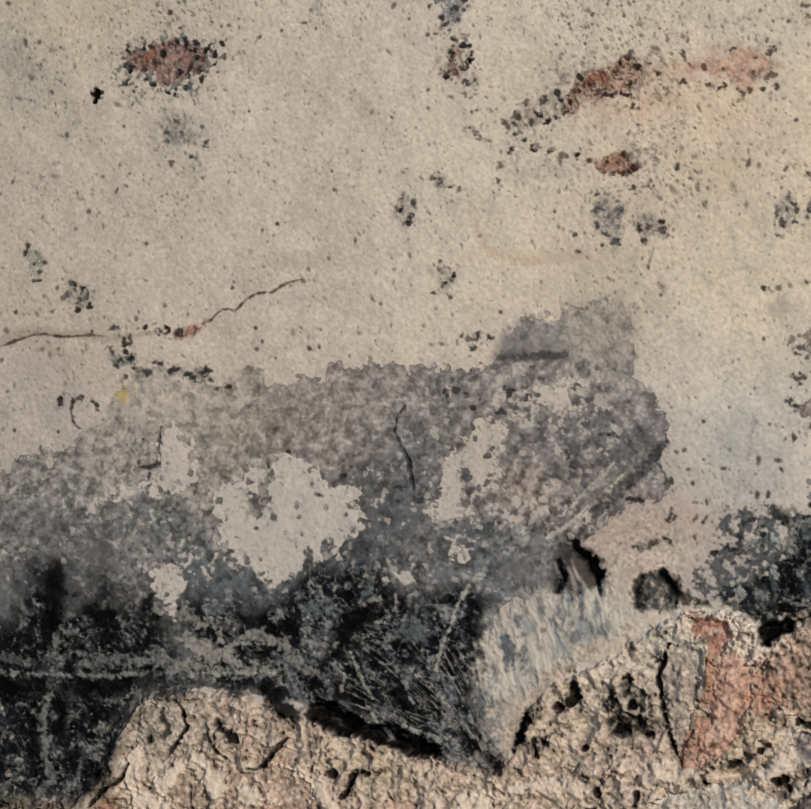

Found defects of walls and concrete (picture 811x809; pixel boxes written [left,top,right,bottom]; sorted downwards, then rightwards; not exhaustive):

crack [208,279,301,322]
peeling [0,301,674,719]
damp [632,536,672,552]
damp [691,478,811,628]
spalling [758,609,811,647]
crack [88,762,130,808]
crack [168,709,228,760]
crack [247,737,289,771]
damp [0,536,623,807]
spalling [262,663,445,760]
spalling [605,672,655,739]
crack [656,643,683,763]